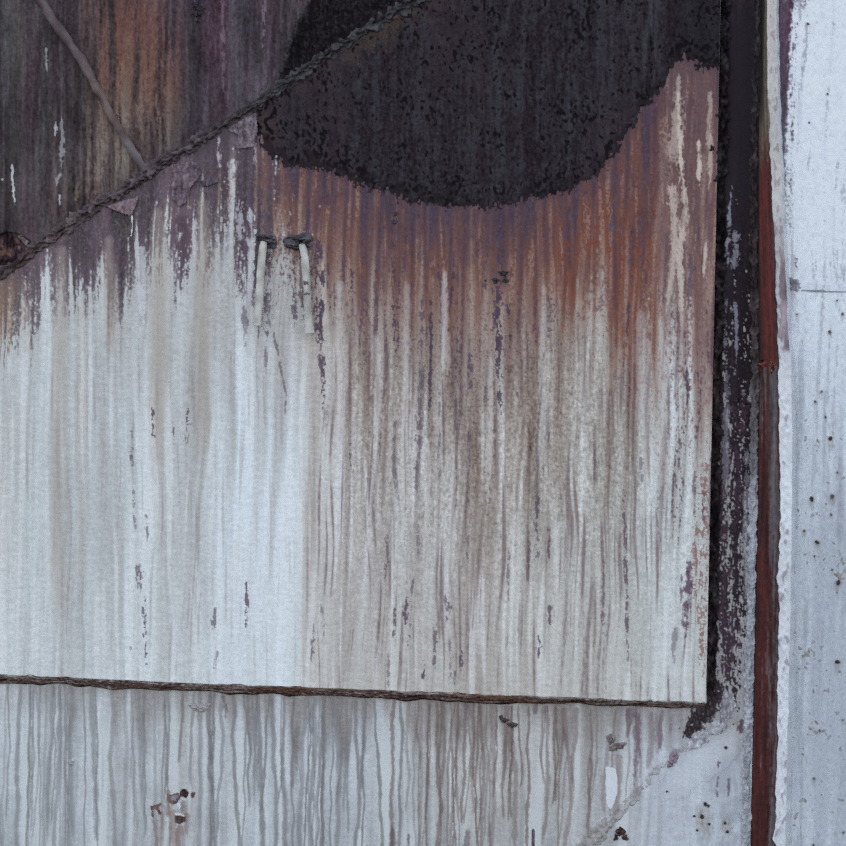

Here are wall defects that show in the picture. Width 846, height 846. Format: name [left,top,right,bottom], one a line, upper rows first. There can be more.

damp [46,245,90,635]
damp [132,206,173,488]
damp [190,136,254,467]
rust [0,0,721,679]
rust [0,387,751,787]
damp [370,334,384,543]
damp [394,281,414,577]
damp [439,270,452,386]
damp [536,284,549,501]
damp [631,73,714,542]
peeling [151,789,195,846]
damp [0,684,666,846]